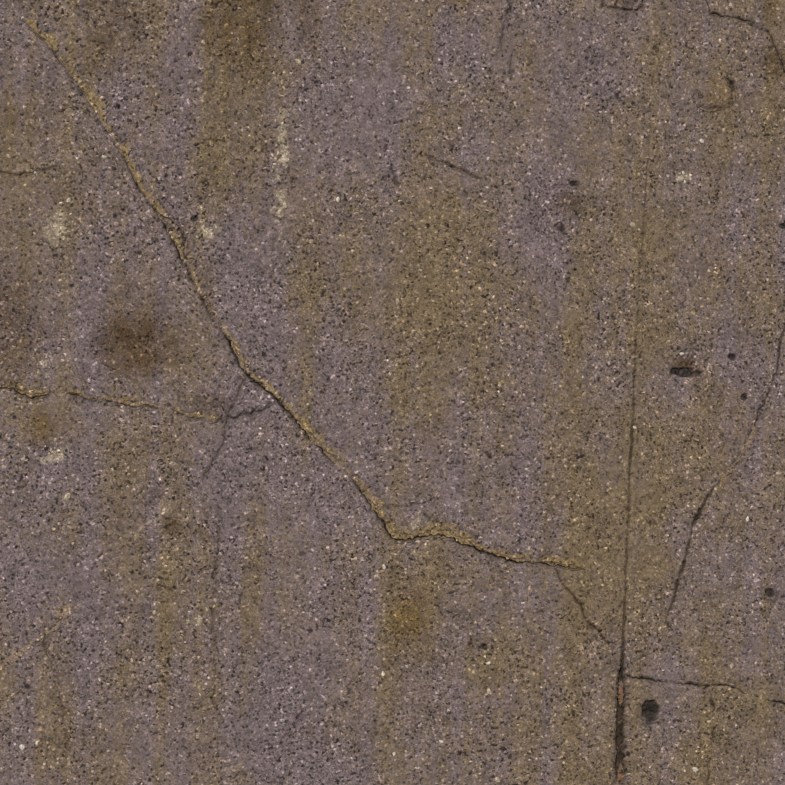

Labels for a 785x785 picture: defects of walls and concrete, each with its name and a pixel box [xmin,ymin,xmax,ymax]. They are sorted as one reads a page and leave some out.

damp [0,0,156,152]
damp [194,222,228,239]
damp [190,0,333,223]
damp [259,100,290,248]
crack [601,0,646,13]
crack [706,0,785,75]
damp [75,266,201,392]
crack [0,0,610,727]
crack [611,69,785,785]